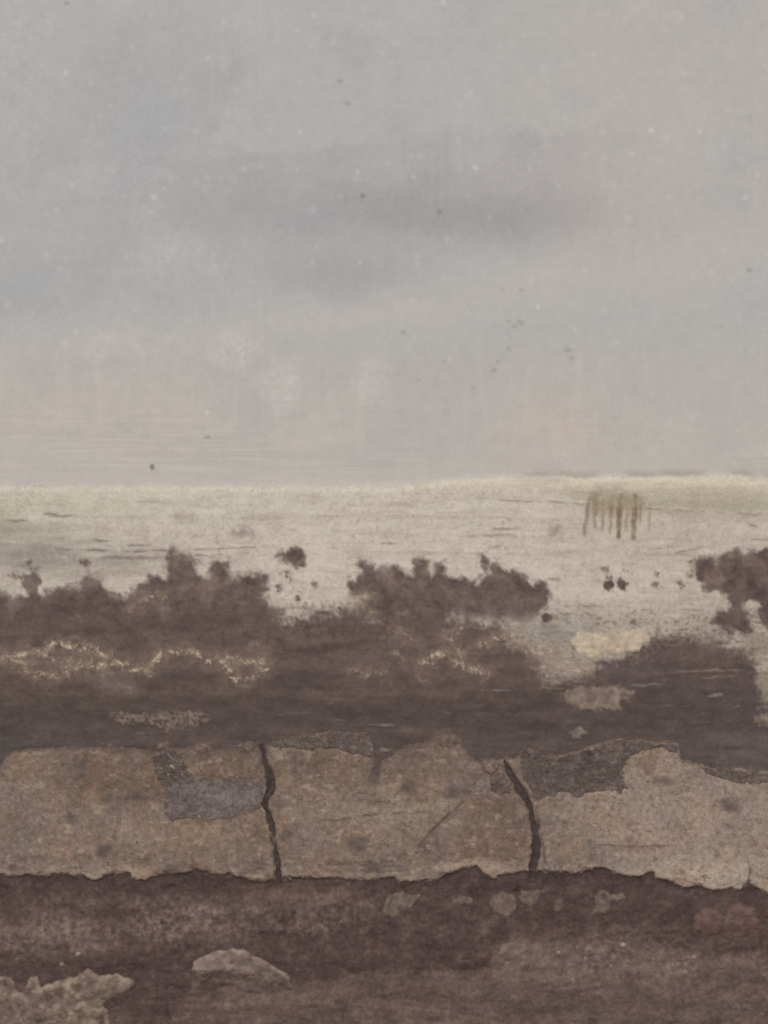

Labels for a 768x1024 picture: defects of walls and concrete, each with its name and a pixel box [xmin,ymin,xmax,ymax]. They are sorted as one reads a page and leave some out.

rust [581,507,653,541]
spalling [152,749,267,821]
crack [188,743,281,882]
crack [499,760,549,881]
spalling [489,681,679,802]